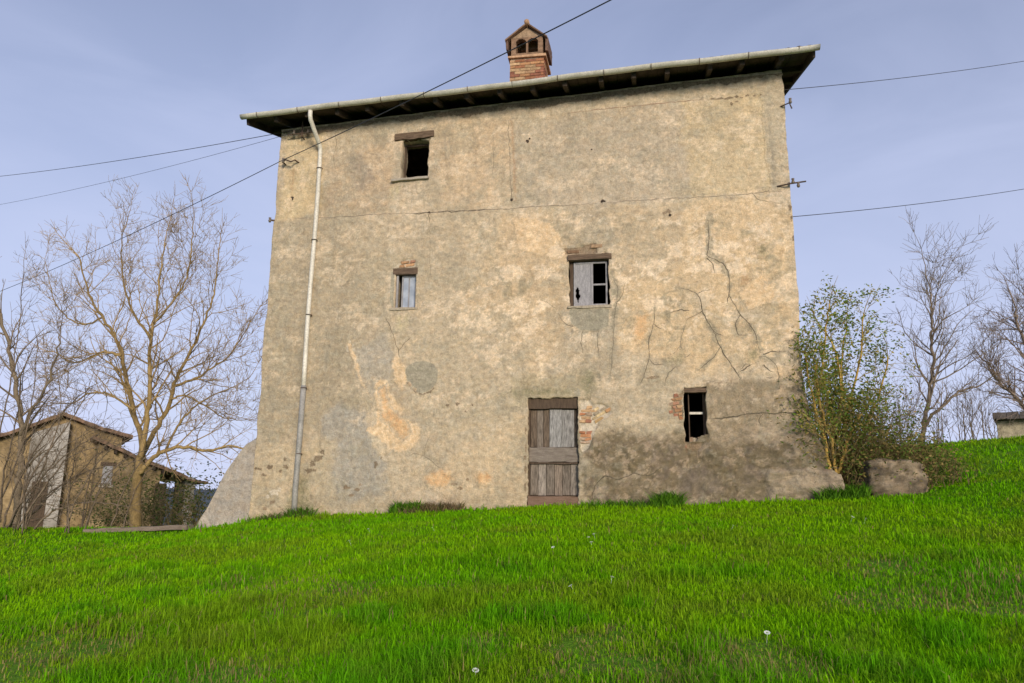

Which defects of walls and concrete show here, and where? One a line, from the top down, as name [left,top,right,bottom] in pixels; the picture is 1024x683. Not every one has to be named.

crack [295,121,809,426]
flaking render [346,341,423,469]
spalling [579,399,612,452]
spalling [669,390,684,420]